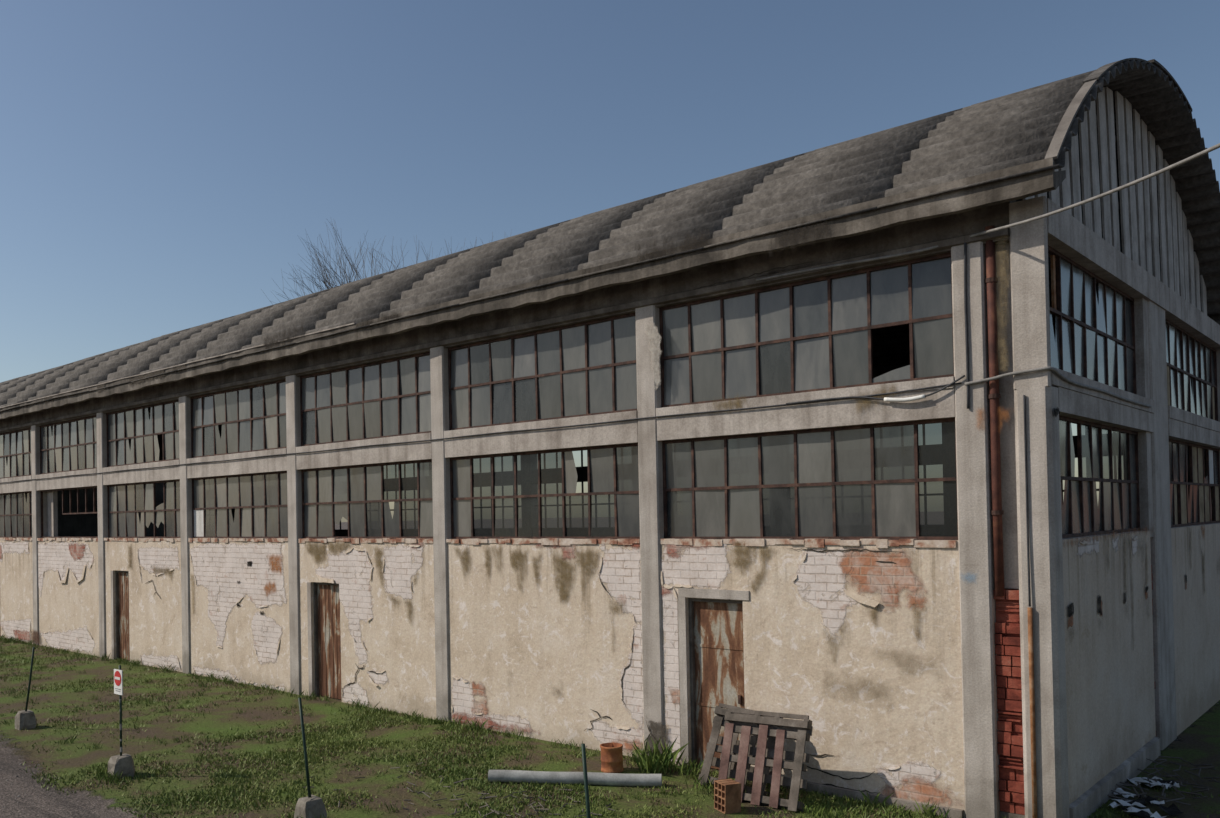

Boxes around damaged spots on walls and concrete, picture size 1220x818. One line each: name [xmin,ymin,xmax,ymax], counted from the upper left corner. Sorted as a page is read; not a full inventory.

peeling [0,541,95,596]
peeling [138,542,287,664]
peeling [316,542,423,706]
water stain [456,549,468,571]
water stain [485,549,538,581]
water stain [553,551,598,601]
peeling [792,548,926,635]
peeling [140,654,285,691]
peeling [590,543,730,761]
peeling [451,675,532,735]
crack [807,754,879,794]